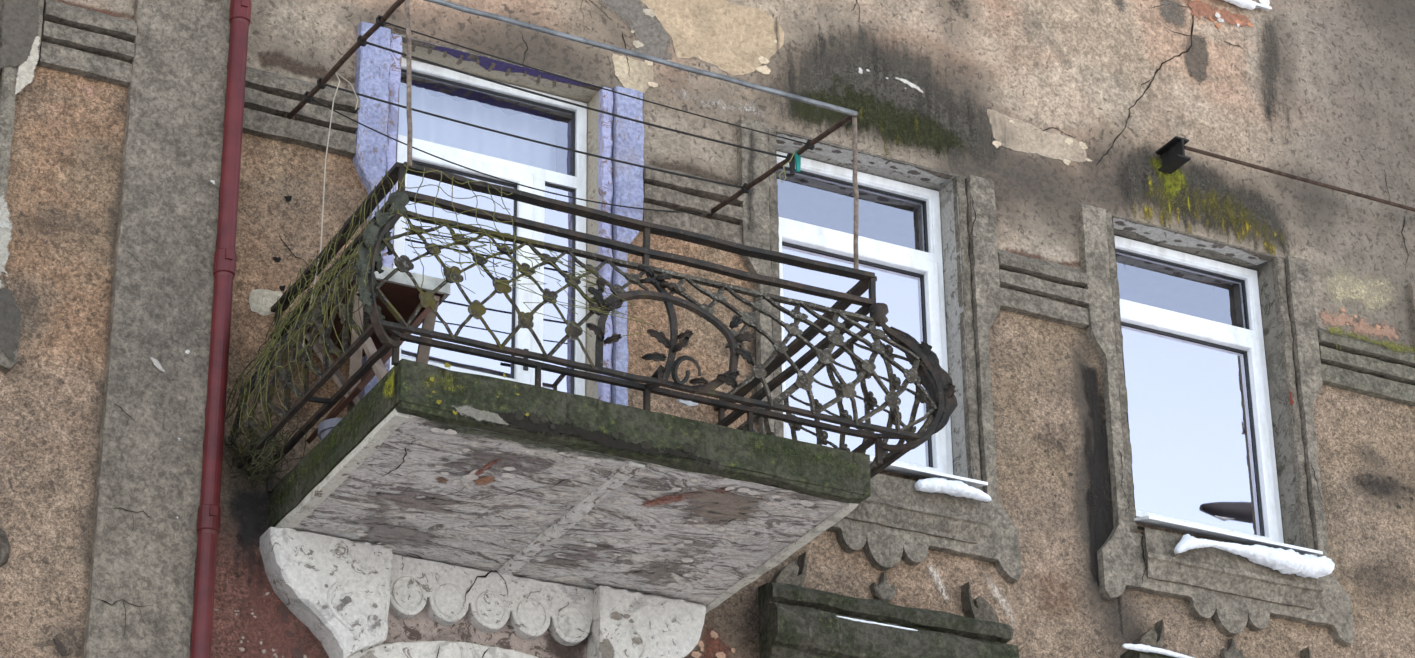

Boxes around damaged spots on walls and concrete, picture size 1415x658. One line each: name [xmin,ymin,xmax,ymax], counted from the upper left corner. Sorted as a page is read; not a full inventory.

peeling [15,36,40,94]
peeling [600,0,784,94]
water stain [776,21,999,163]
peeling [987,109,1093,166]
crack [1096,0,1243,165]
flaking render [1185,0,1254,29]
peeling [0,192,13,289]
water stain [1117,147,1287,253]
flaking render [1318,276,1401,341]